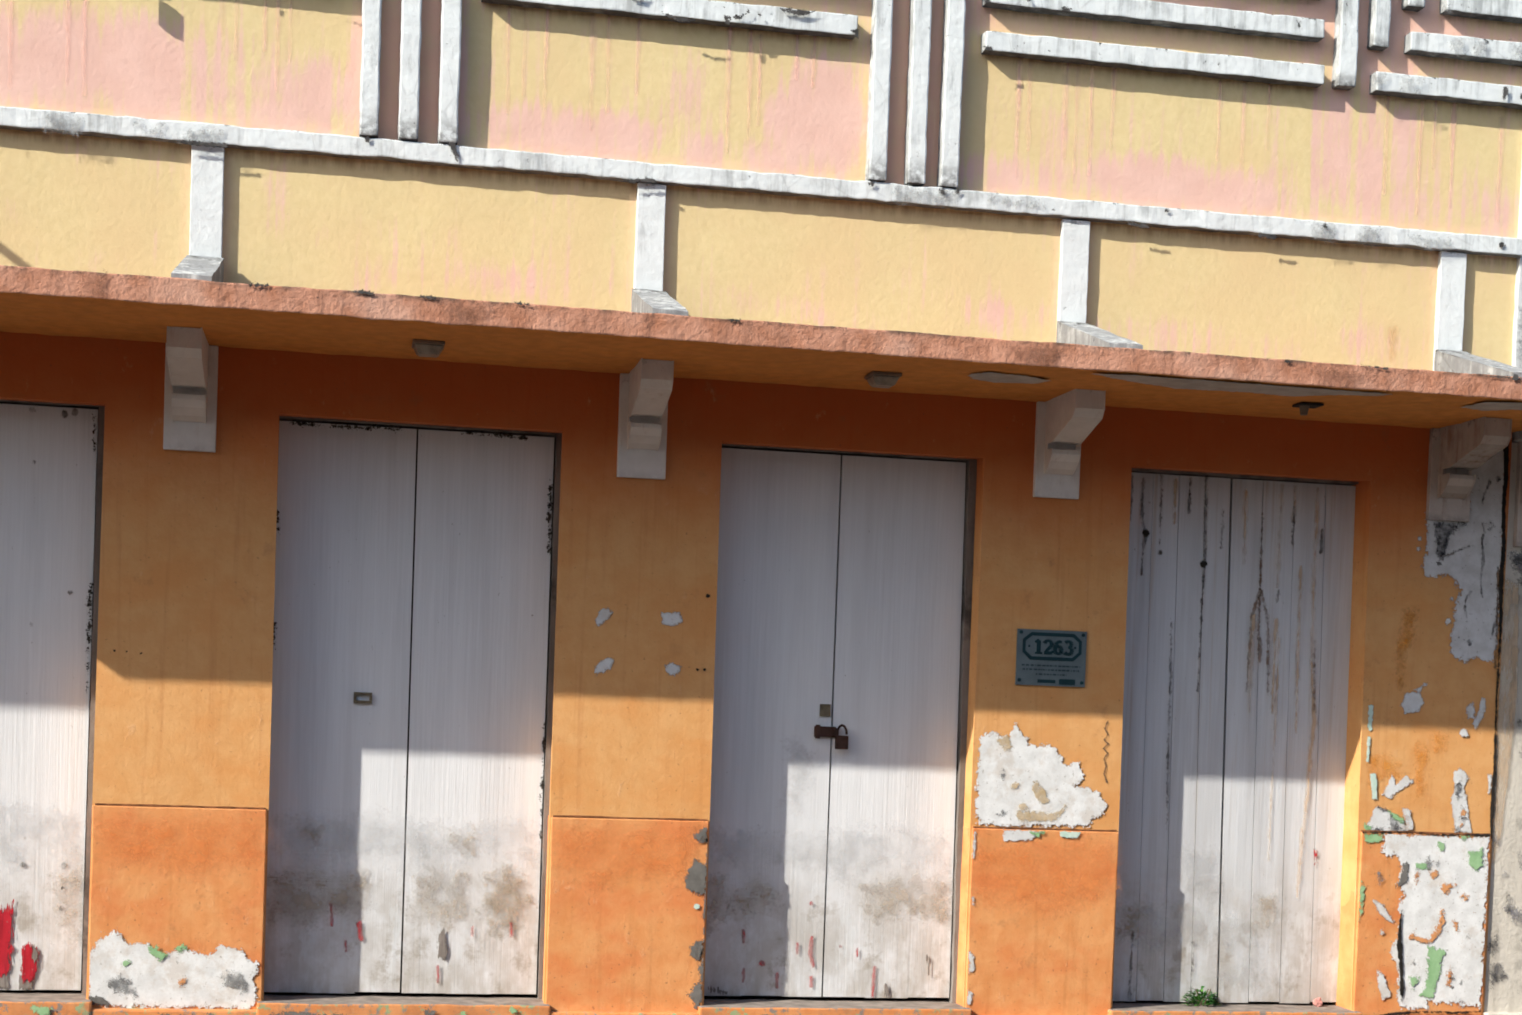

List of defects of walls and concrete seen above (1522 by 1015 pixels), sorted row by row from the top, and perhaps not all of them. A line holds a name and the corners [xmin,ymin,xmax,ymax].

peeling [1416,450,1504,664]
peeling [594,658,614,674]
peeling [661,612,683,626]
peeling [1400,682,1428,714]
peeling [1459,698,1486,737]
leakage [1493,551,1522,843]
peeling [971,722,1108,859]
peeling [1357,705,1490,1010]
peeling [88,930,344,1015]
spalling [684,827,728,1010]
peeling [967,951,975,1005]
leakage [1487,894,1522,989]